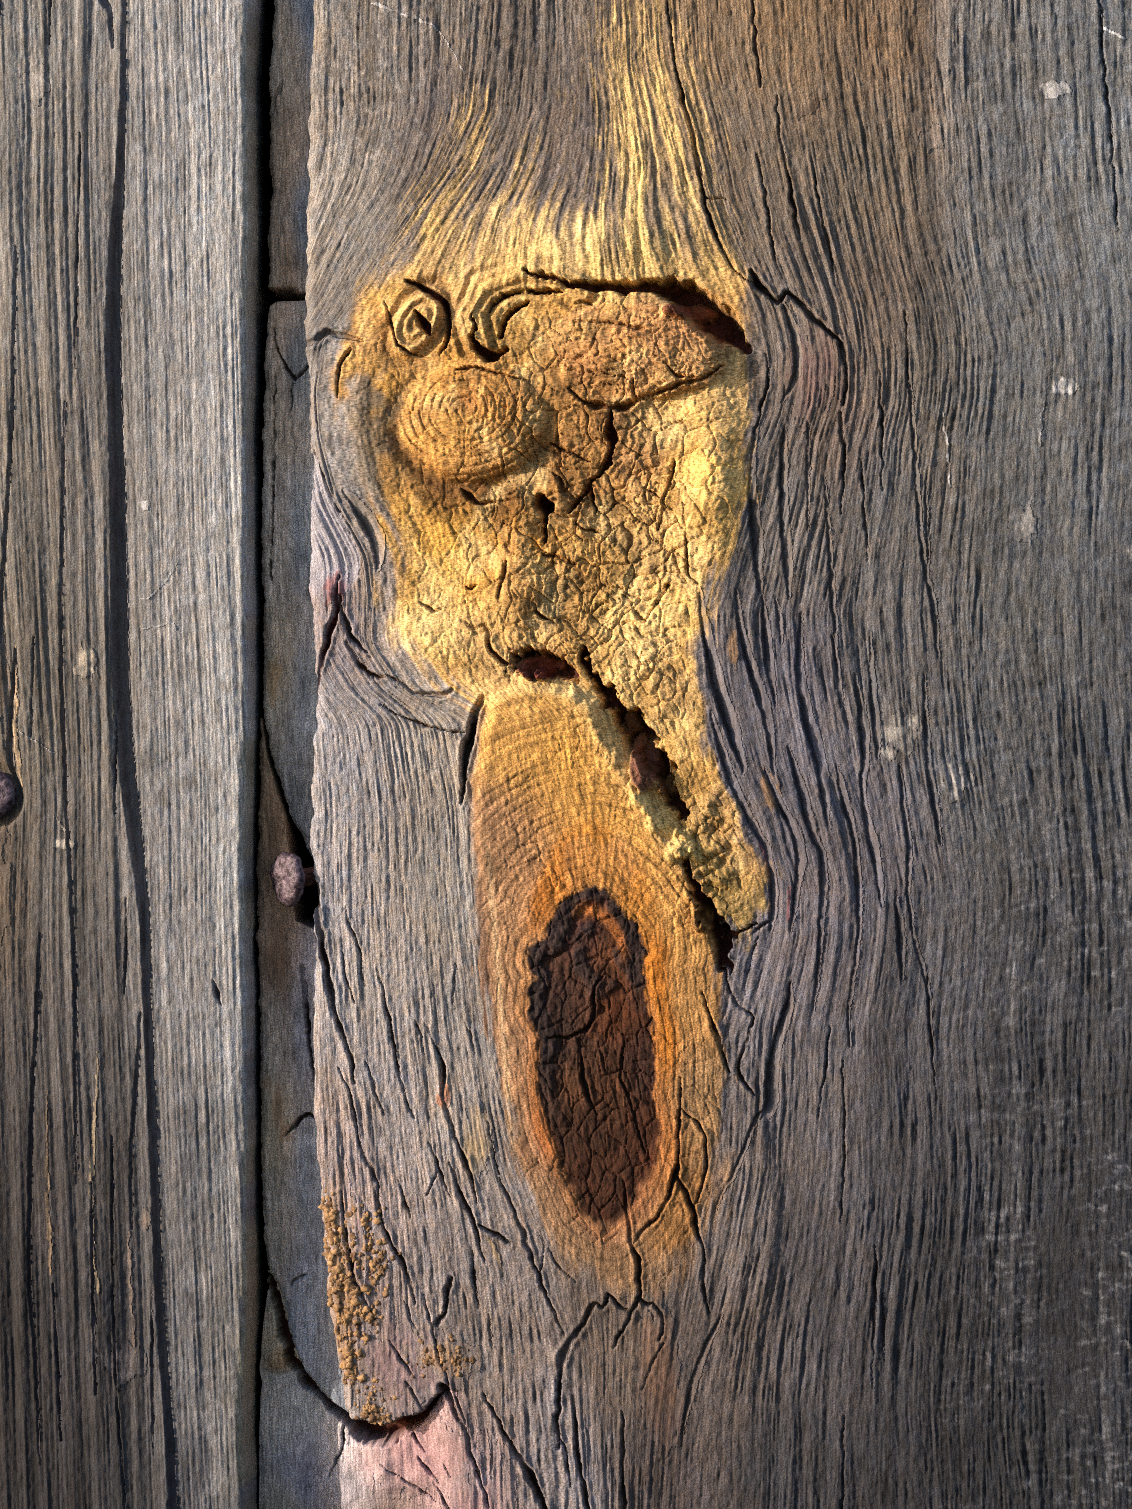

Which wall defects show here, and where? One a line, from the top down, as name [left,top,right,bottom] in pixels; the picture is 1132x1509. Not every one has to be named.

crack [0,0,177,1509]
crack [269,0,943,1509]